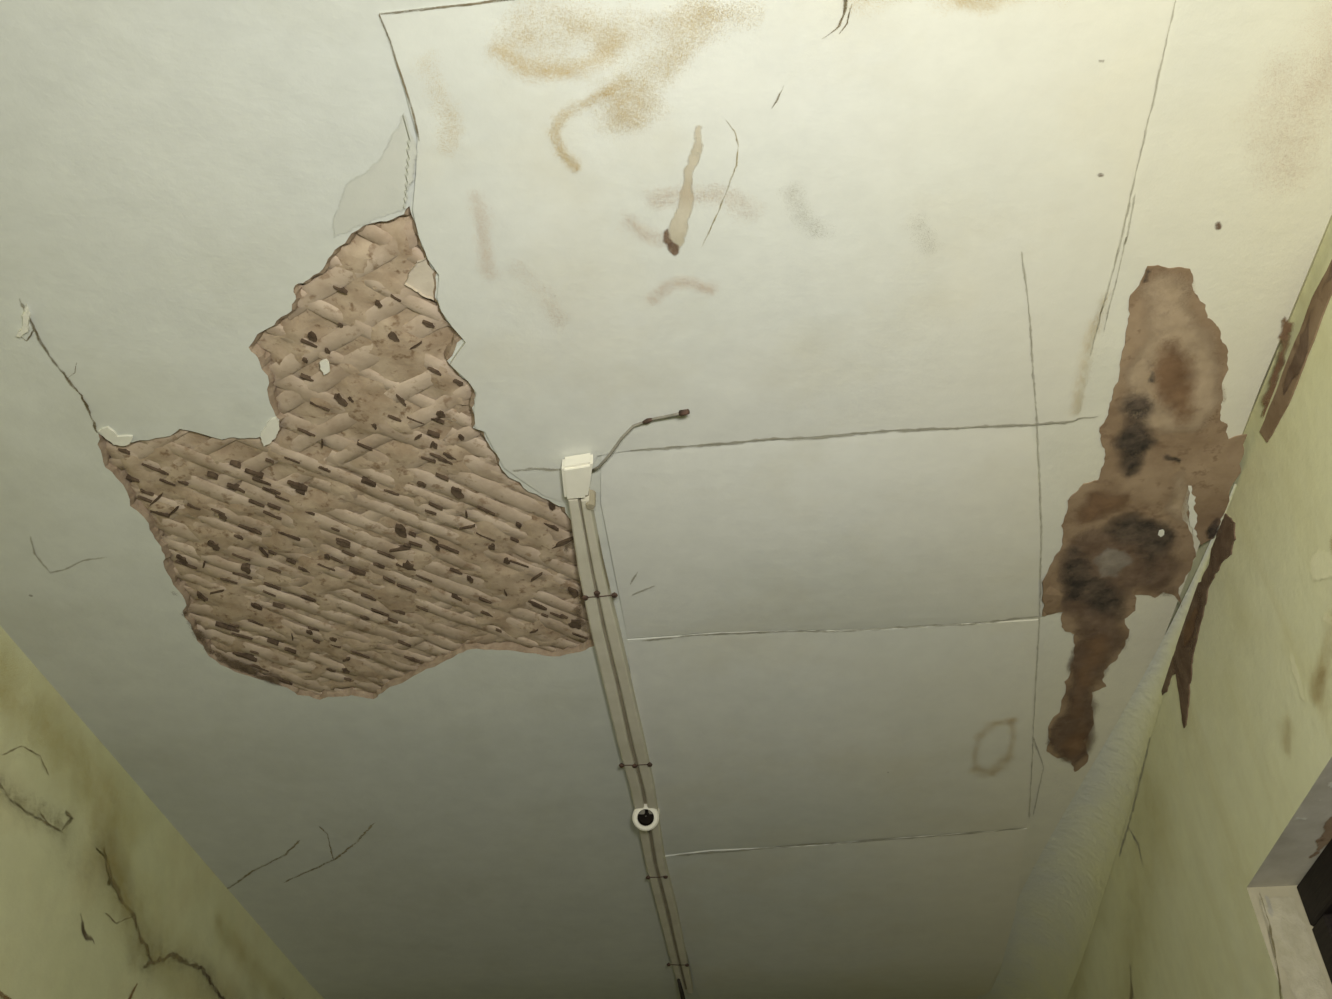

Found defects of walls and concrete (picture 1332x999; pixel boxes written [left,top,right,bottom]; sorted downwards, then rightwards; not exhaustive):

damp [485,0,767,173]
damp [614,126,835,256]
crack [19,299,97,433]
spalling [98,206,594,699]
flaking render [1042,260,1332,772]
crack [0,745,73,831]
crack [229,823,374,889]
spalling [1309,816,1332,858]
crack [81,848,225,999]